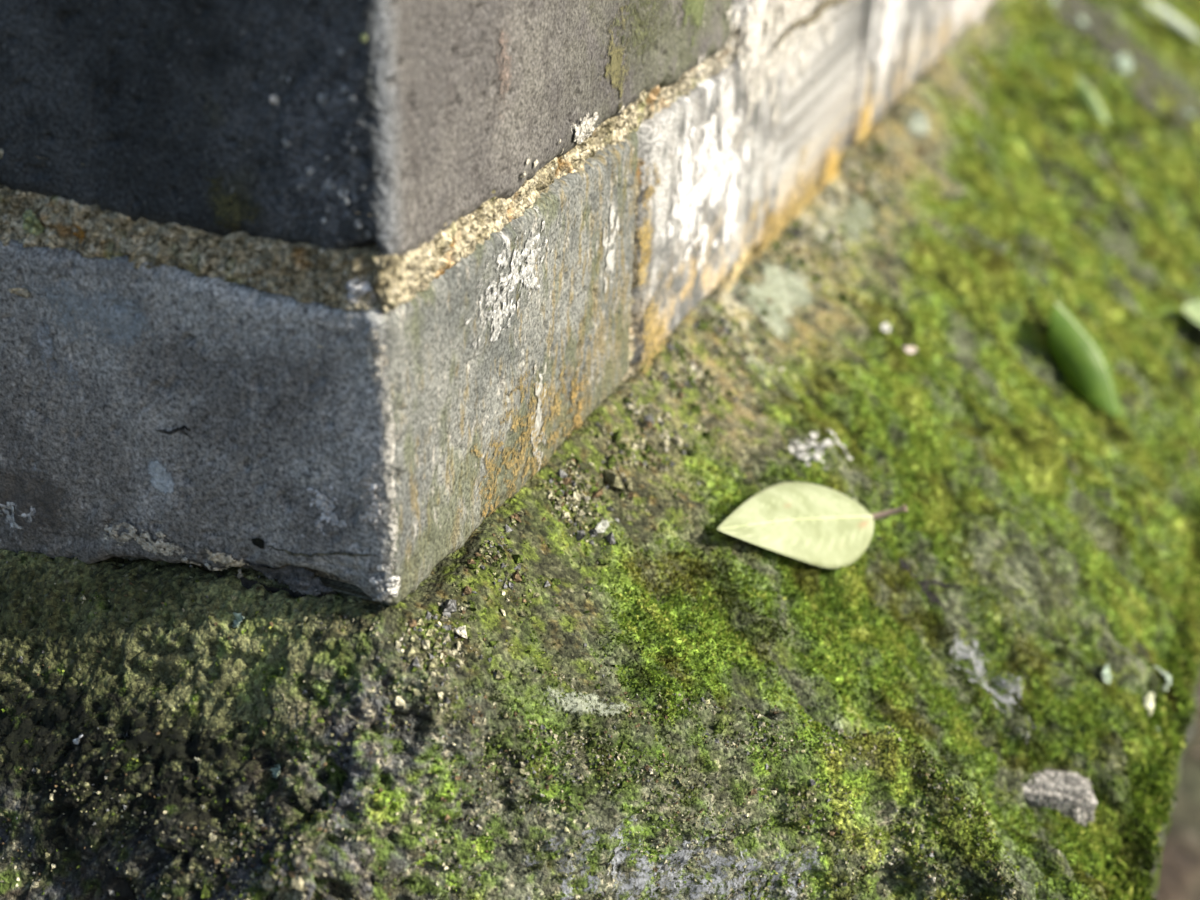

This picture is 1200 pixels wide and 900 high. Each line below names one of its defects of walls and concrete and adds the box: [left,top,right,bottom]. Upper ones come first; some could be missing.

damp [466,207,558,349]
damp [603,199,620,293]
damp [530,364,547,478]